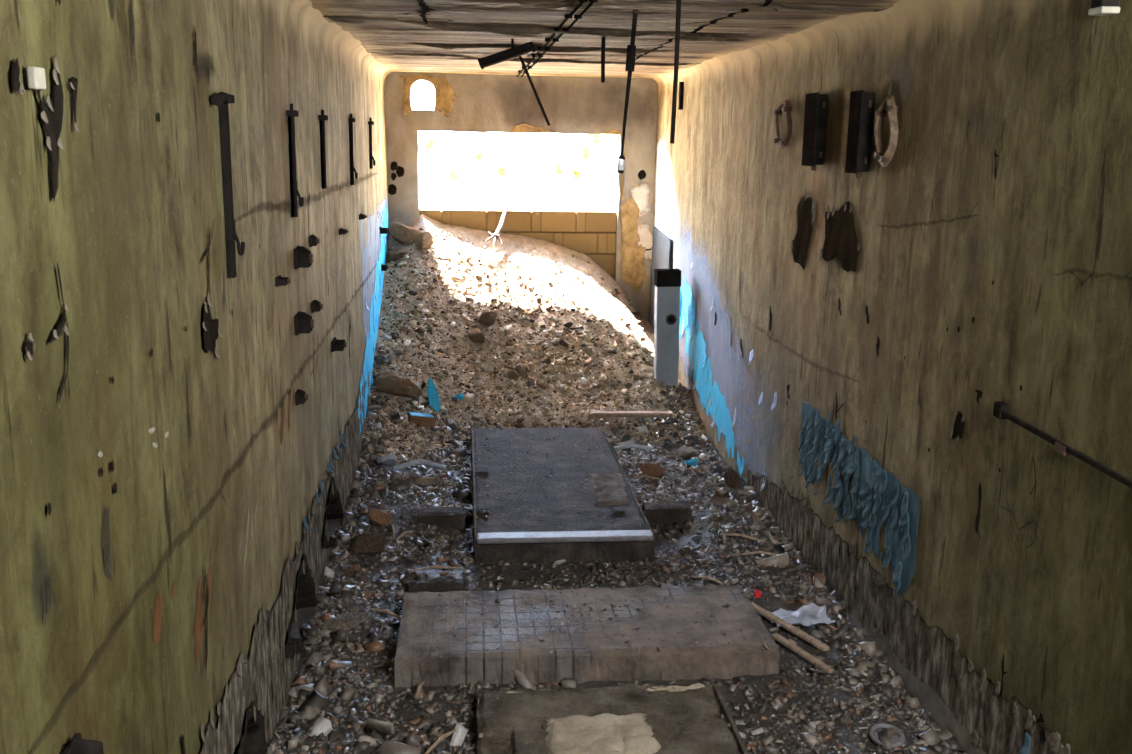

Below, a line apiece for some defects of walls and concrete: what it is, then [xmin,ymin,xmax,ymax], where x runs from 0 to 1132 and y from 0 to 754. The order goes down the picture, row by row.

crack [323,0,889,66]
flaking render [185,161,405,754]
crack [201,570,209,673]